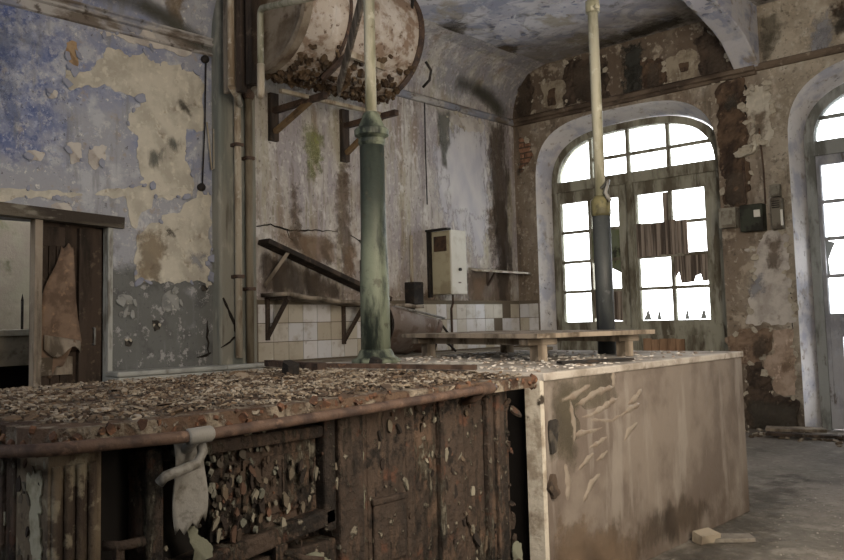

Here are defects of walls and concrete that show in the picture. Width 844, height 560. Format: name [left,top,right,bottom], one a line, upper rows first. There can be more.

corrosion [265,44,365,104]
corrosion [376,65,416,105]
spalling [515,73,546,118]
spalling [556,56,591,109]
spalling [600,53,611,98]
spalling [640,57,672,89]
peeling [62,30,214,312]
peeling [0,185,82,211]
crack [256,223,361,243]
peeling [116,294,137,319]